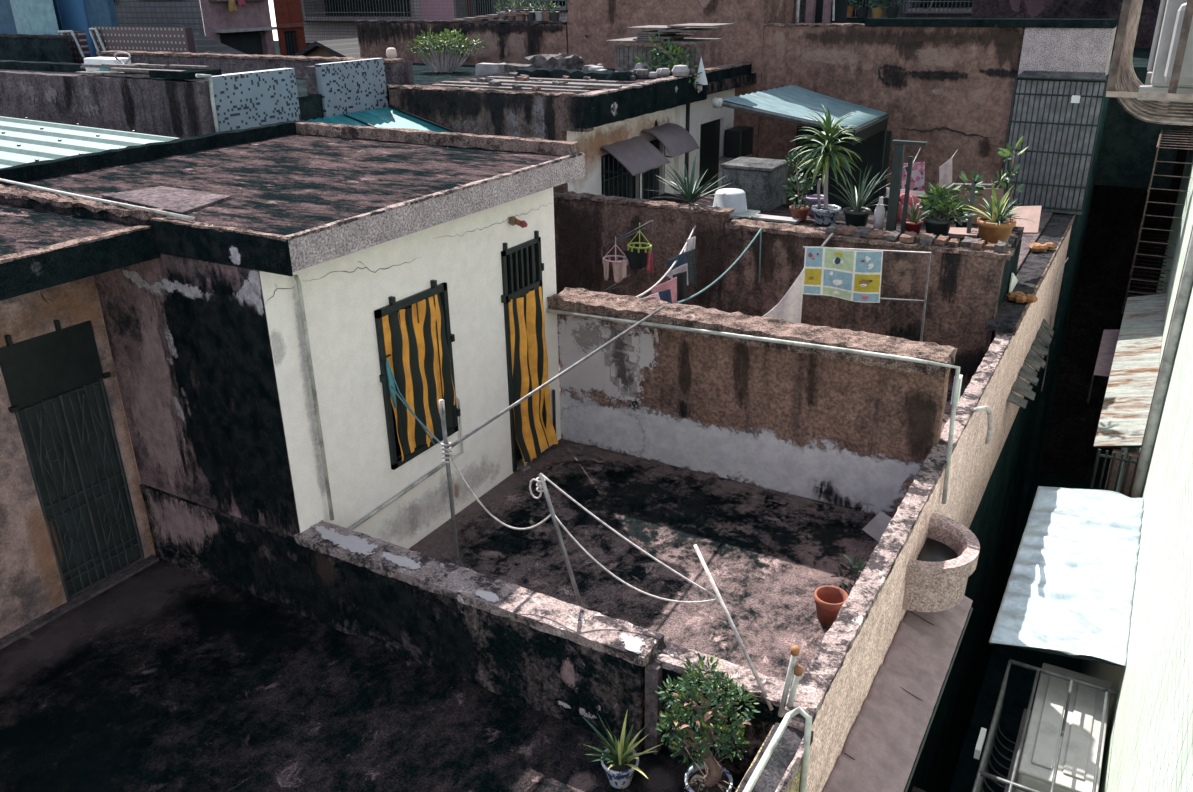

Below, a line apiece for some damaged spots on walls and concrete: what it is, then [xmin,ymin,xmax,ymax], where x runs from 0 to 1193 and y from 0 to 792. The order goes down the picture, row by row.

damp [62,76,73,109]
damp [120,79,134,131]
damp [162,81,199,138]
flaking render [229,247,264,316]
flaking render [123,270,218,553]
damp [678,339,691,418]
peeling [558,314,921,514]
damp [733,343,750,408]
damp [808,355,816,405]
damp [905,390,937,455]
damp [0,228,490,792]